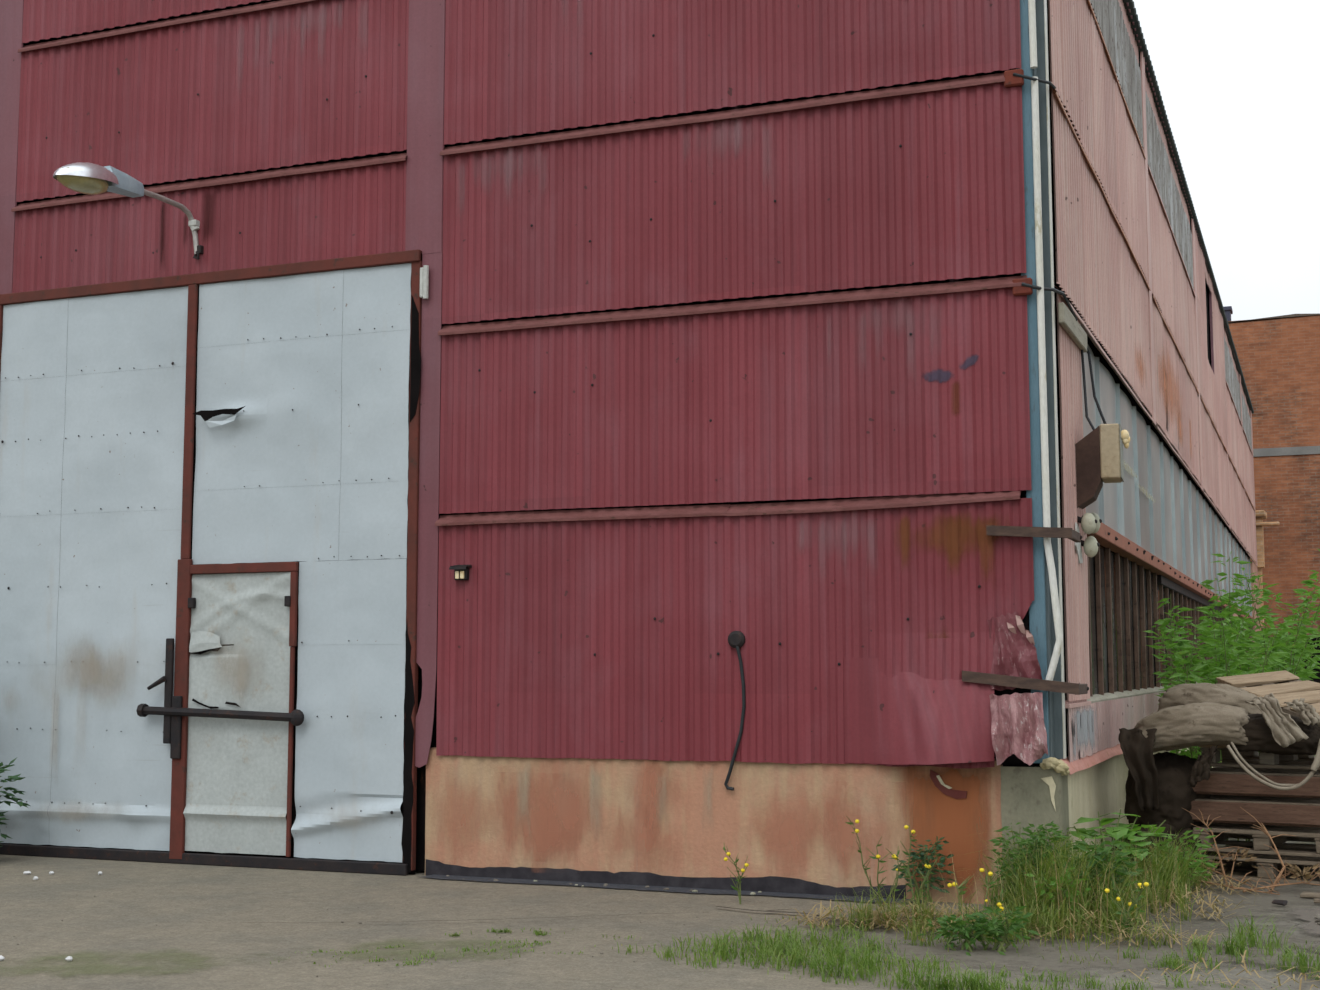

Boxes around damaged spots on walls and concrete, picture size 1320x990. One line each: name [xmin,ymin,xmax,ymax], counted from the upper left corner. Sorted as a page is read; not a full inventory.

peeling [1007,615,1035,645]
corrosion [907,767,988,896]